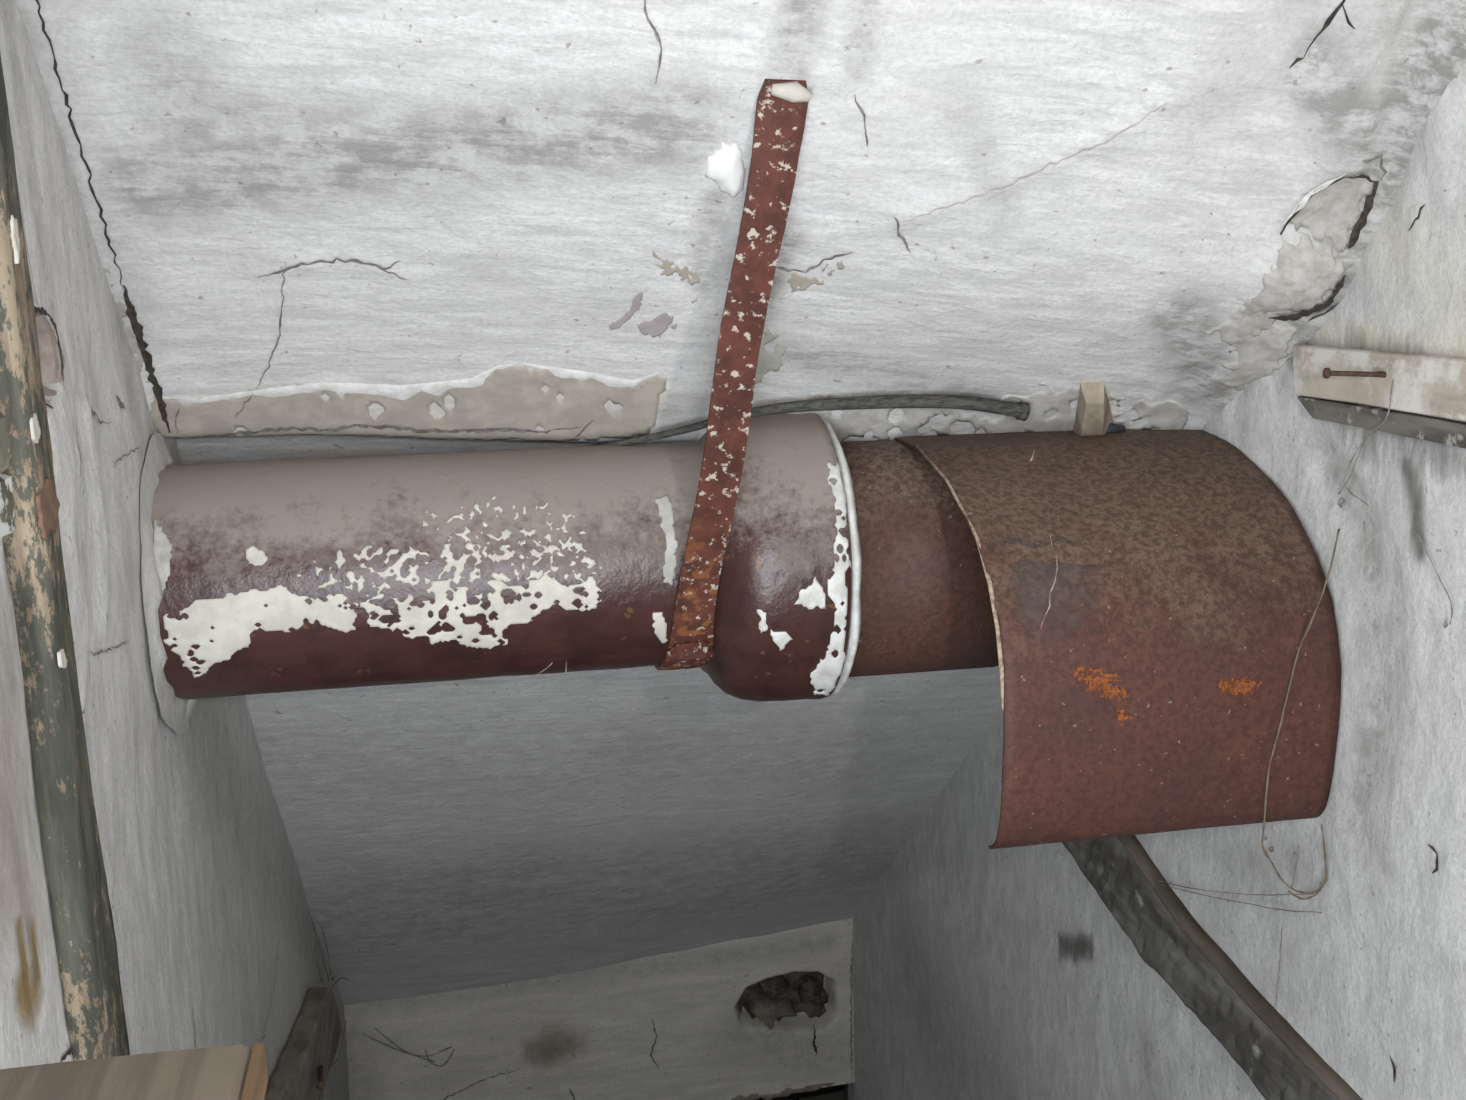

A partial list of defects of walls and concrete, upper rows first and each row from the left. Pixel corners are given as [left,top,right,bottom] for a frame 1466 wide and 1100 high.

crack [644,0,662,81]
crack [1289,0,1355,69]
crack [35,0,594,477]
flaking render [1207,154,1387,391]
flaking render [34,306,65,409]
peeling [150,363,667,442]
flaking render [736,971,829,1055]